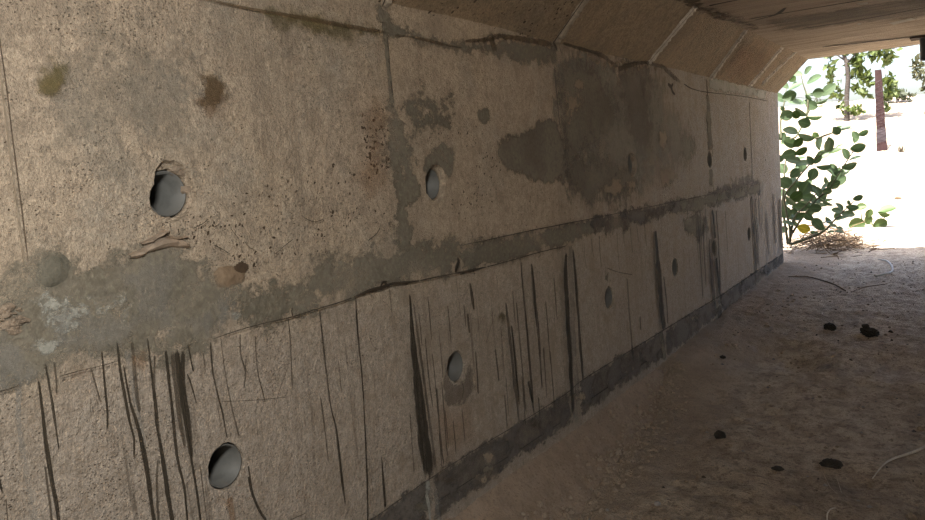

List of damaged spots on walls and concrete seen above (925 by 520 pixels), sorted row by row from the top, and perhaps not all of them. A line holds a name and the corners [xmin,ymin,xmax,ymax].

damp [401,86,455,137]
crack [214,193,715,339]
damp [38,293,91,520]
damp [91,351,108,428]
damp [117,339,239,520]
damp [240,335,265,401]
damp [248,466,266,520]
damp [319,311,346,503]
damp [355,196,784,520]